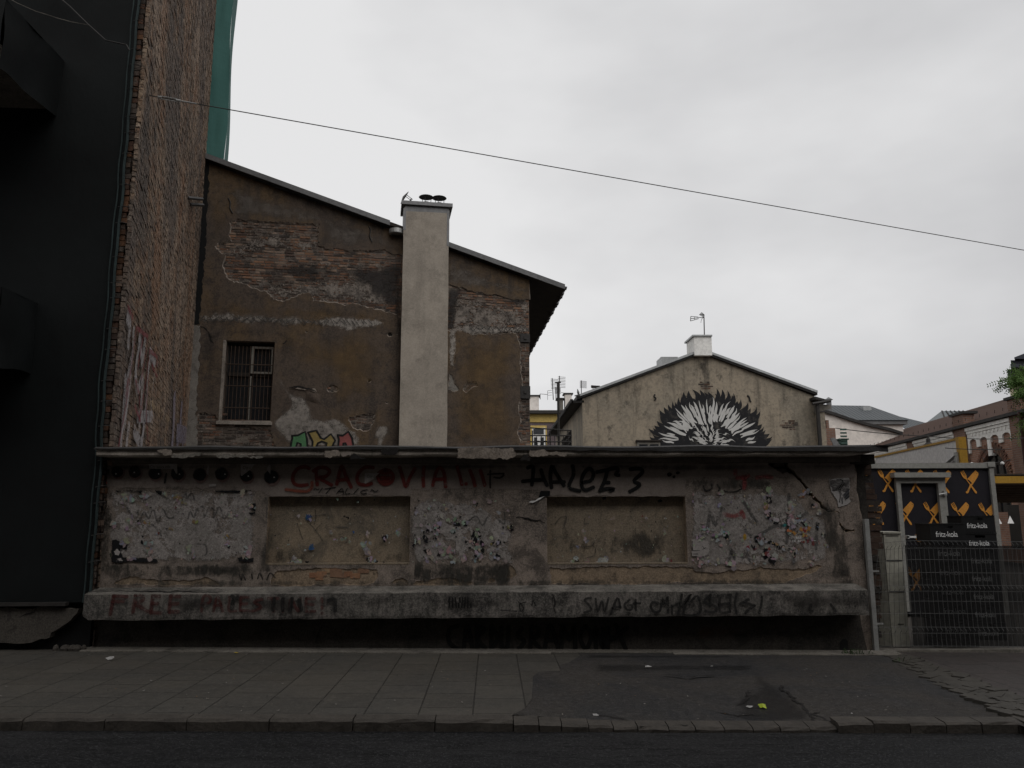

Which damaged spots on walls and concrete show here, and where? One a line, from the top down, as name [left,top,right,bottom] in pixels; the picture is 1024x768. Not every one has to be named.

spalling [200,219,403,330]
spalling [448,285,530,392]
crack [768,463,851,532]